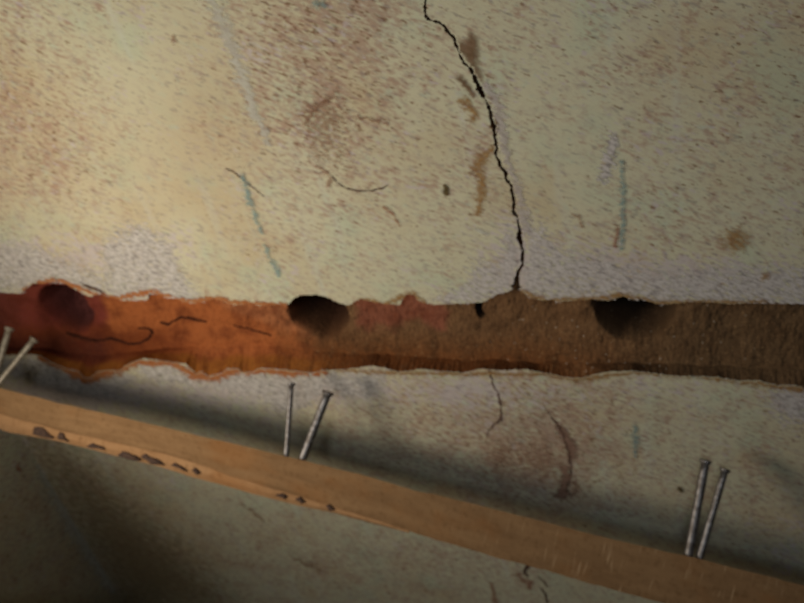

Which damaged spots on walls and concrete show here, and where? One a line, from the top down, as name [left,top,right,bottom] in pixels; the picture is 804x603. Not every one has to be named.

crack [423,0,533,288]
flaking render [0,221,394,419]
crack [486,370,503,437]